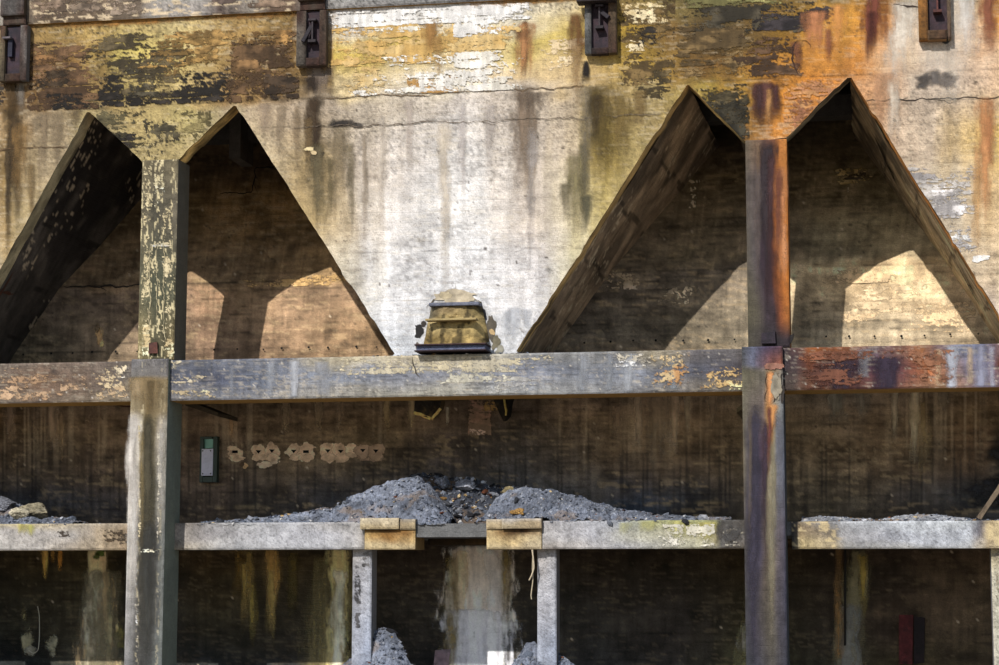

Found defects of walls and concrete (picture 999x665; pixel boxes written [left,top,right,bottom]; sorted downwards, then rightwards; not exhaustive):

peeling [328,3,532,96]
corrosion [861,0,881,50]
water stain [4,83,35,230]
peeling [27,29,299,397]
water stain [515,89,541,210]
corrosion [755,143,786,269]
crack [866,96,999,322]
peeling [0,365,128,401]
peeling [616,352,690,386]
peeling [704,367,742,389]
corrosion [799,349,960,389]
water stain [309,550,353,665]